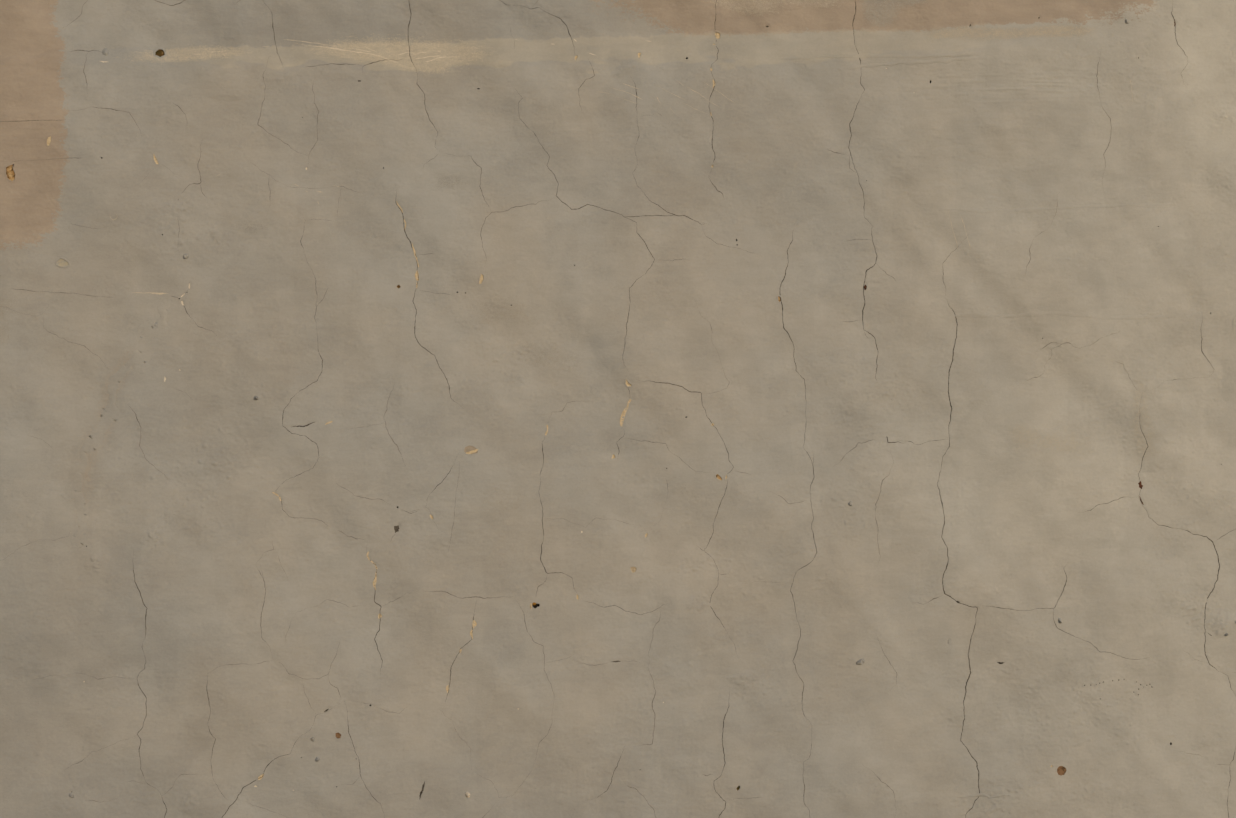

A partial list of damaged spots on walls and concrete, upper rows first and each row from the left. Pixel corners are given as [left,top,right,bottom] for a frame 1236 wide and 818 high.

crack [238,0,748,353]
crack [829,2,896,400]
crack [43,163,753,818]
crack [756,234,1139,818]
crack [1027,333,1236,694]
crack [703,707,762,816]